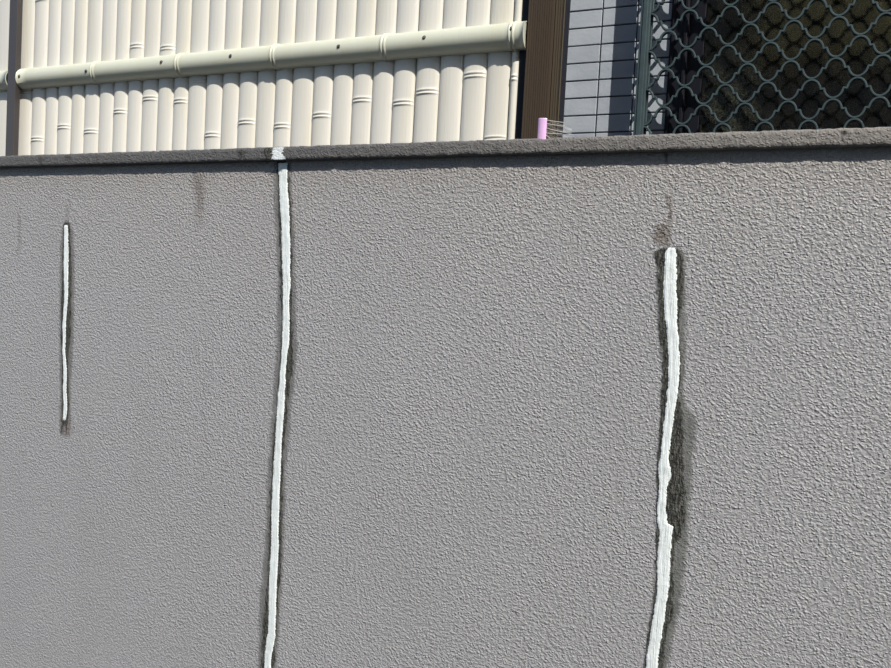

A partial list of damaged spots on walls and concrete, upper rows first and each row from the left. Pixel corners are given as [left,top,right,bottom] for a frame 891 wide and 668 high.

crack [60,222,73,434]
crack [259,161,297,668]
crack [644,247,695,668]